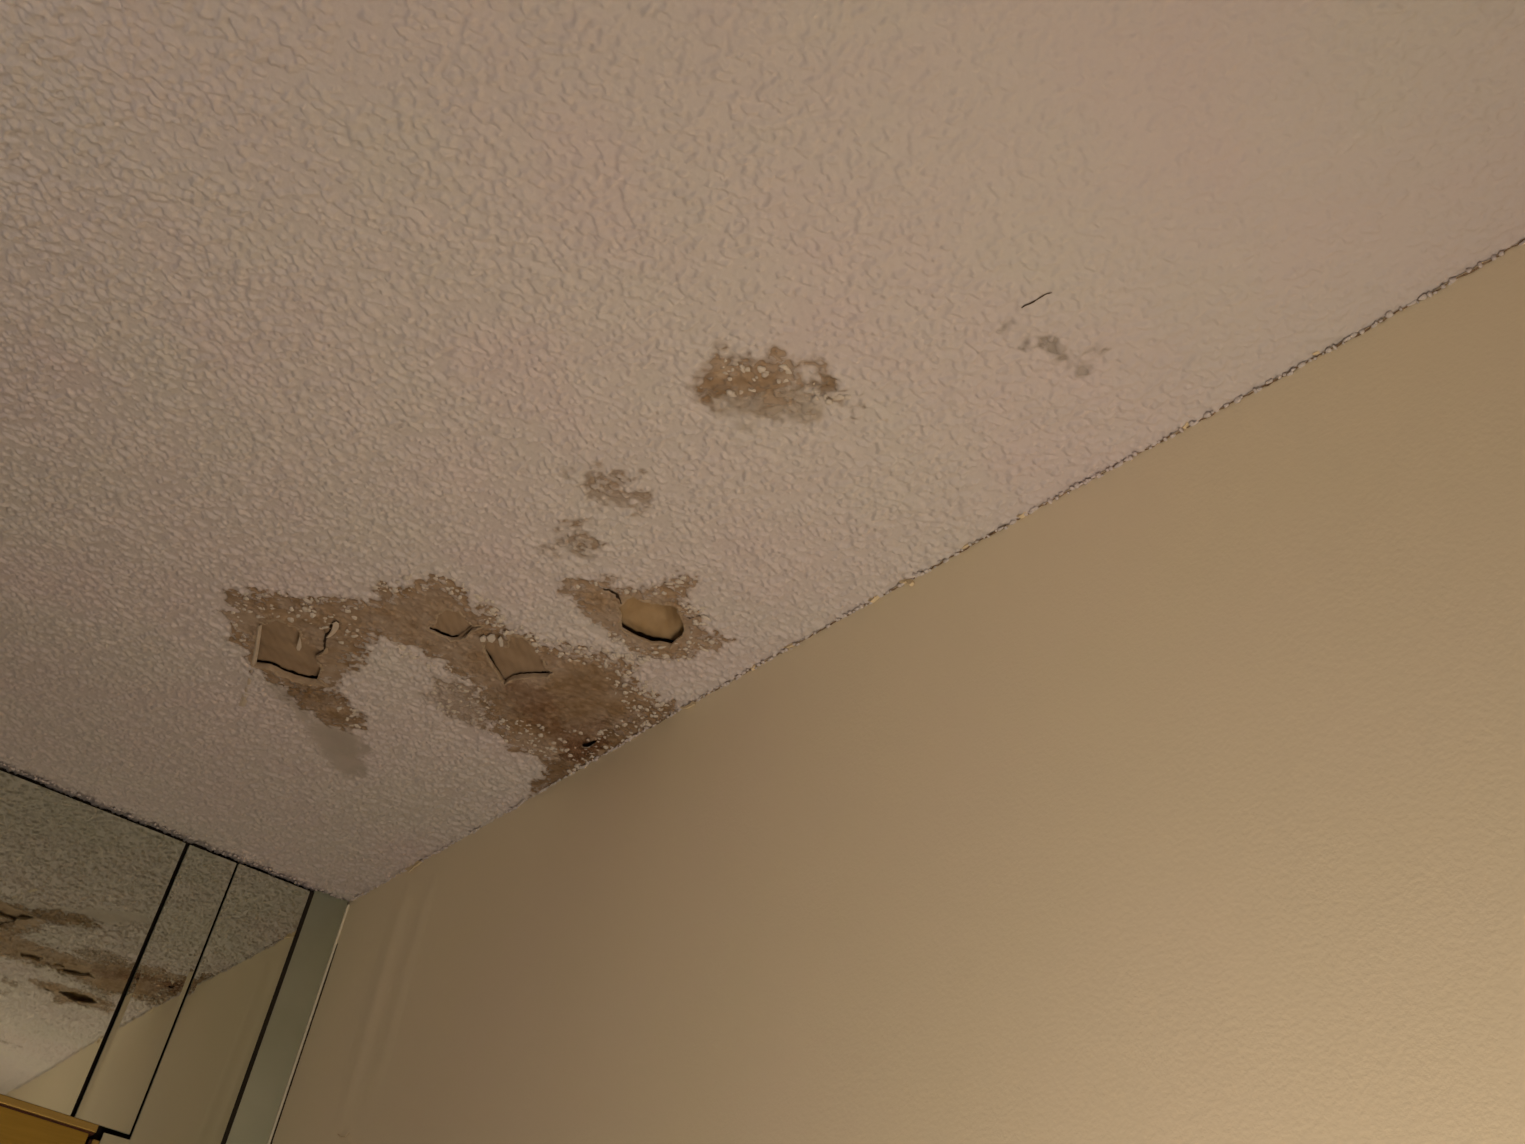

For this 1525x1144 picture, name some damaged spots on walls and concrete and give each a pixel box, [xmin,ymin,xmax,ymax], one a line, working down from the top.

water stain [695,347,851,415]
water stain [585,471,649,498]
water stain [221,574,736,796]